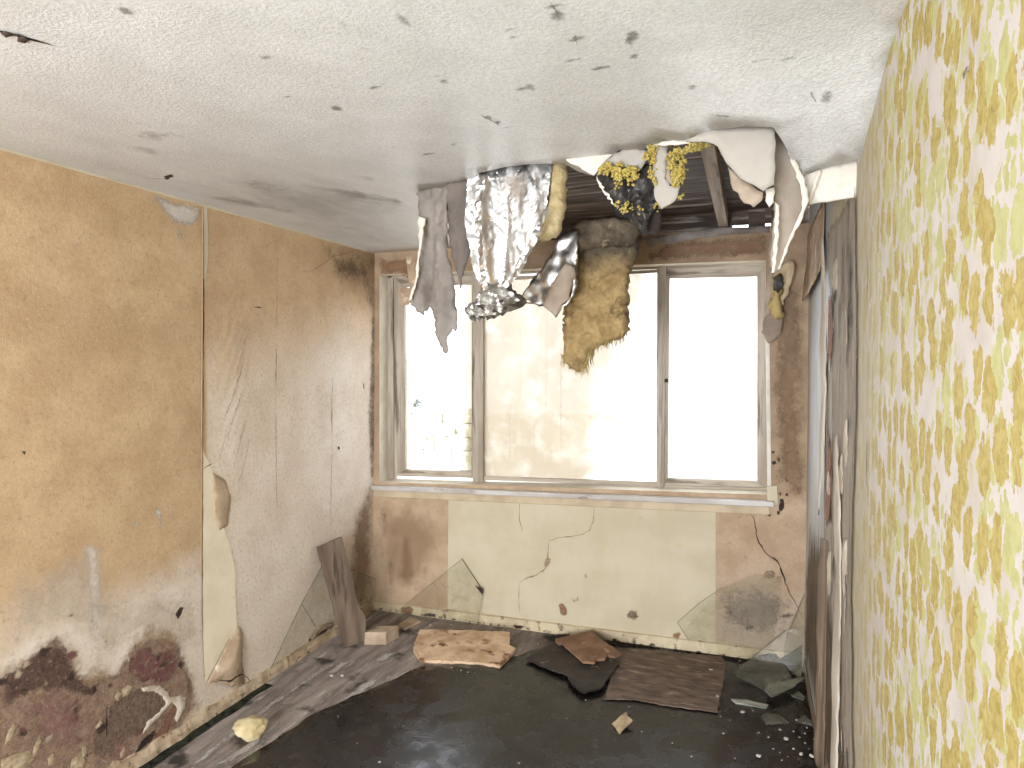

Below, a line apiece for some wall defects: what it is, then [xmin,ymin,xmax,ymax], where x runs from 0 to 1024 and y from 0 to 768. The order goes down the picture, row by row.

spalling [566,154,614,176]
peeling [765,187,775,207]
spalling [828,258,838,372]
water stain [768,291,802,516]
spalling [826,419,848,526]
flaking render [203,452,237,683]
crack [518,516,594,611]
crack [752,514,803,618]
peeling [827,538,847,599]
water stain [0,606,353,768]
water stain [602,639,751,664]
water stain [727,541,844,768]